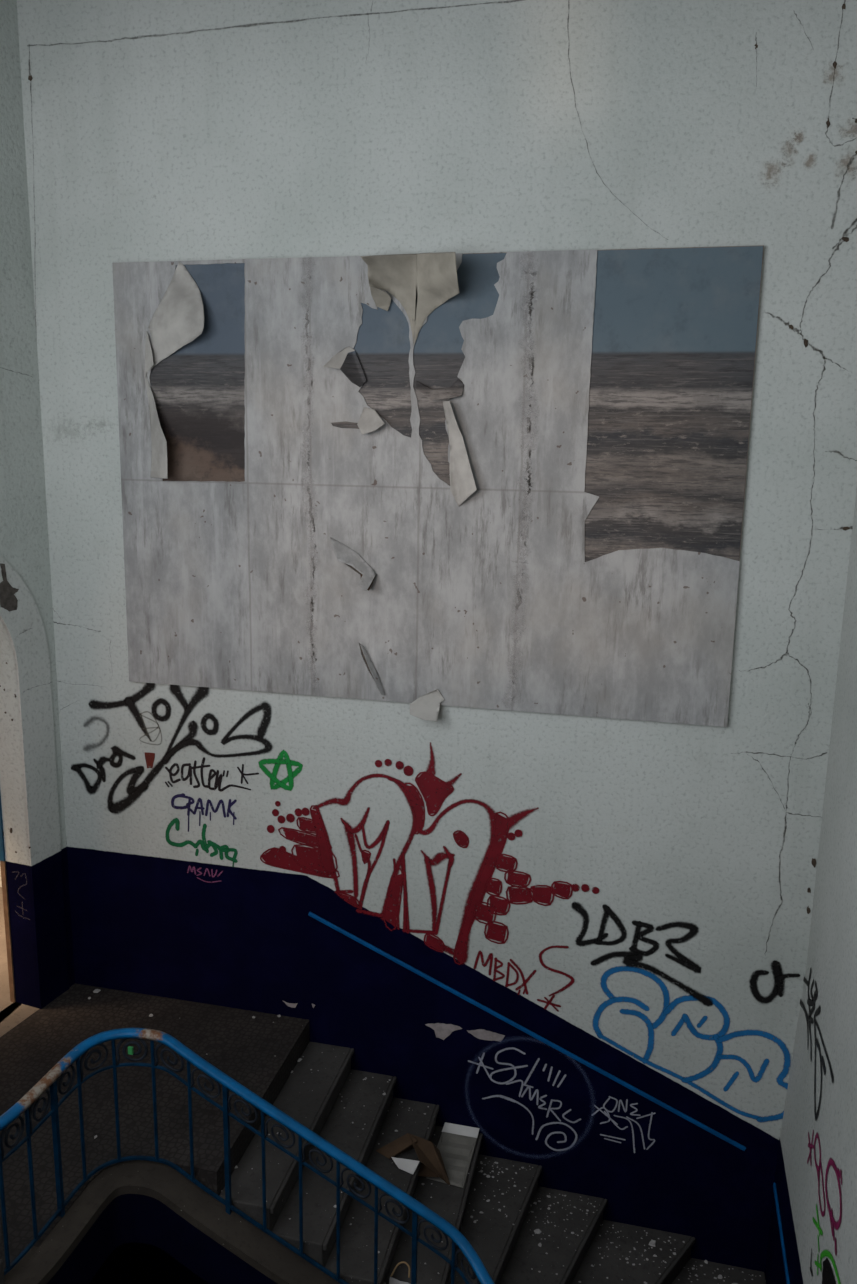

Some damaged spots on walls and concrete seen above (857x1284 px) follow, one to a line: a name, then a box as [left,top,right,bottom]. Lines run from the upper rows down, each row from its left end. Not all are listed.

crack [27,0,522,158]
crack [749,0,857,952]
peeling [425,1023,505,1042]